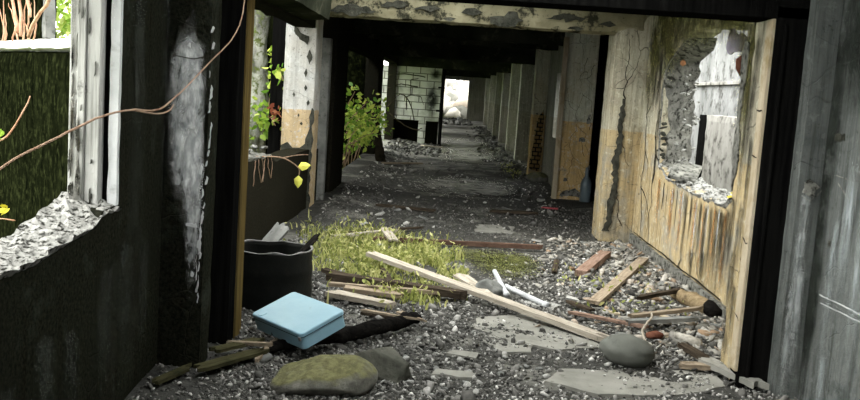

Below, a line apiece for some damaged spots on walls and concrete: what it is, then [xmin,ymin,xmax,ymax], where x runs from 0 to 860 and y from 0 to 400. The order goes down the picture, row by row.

spalling [0,0,121,279]
water stain [165,32,202,259]
peeling [281,27,314,208]
peeling [331,0,523,27]
spalling [529,109,544,172]
peeling [546,13,586,31]
crack [601,39,738,319]
water stain [647,16,760,196]
spalling [657,37,750,209]
water stain [666,191,743,349]